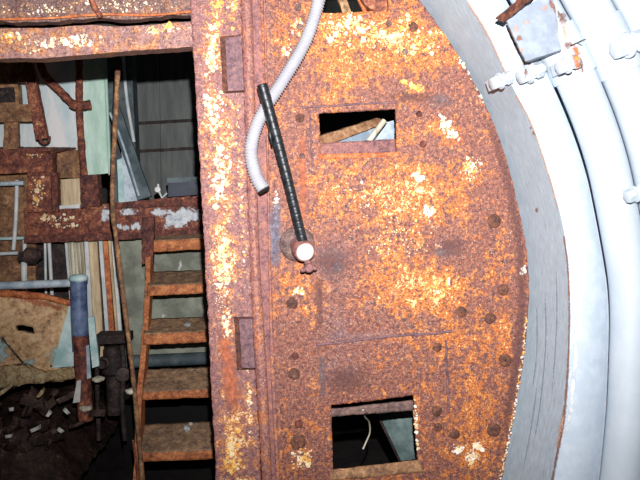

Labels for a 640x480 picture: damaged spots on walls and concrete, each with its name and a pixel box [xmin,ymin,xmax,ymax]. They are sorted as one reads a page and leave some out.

corrosion [495,0,531,23]
corrosion [545,1,583,72]
corrosion [490,128,526,436]